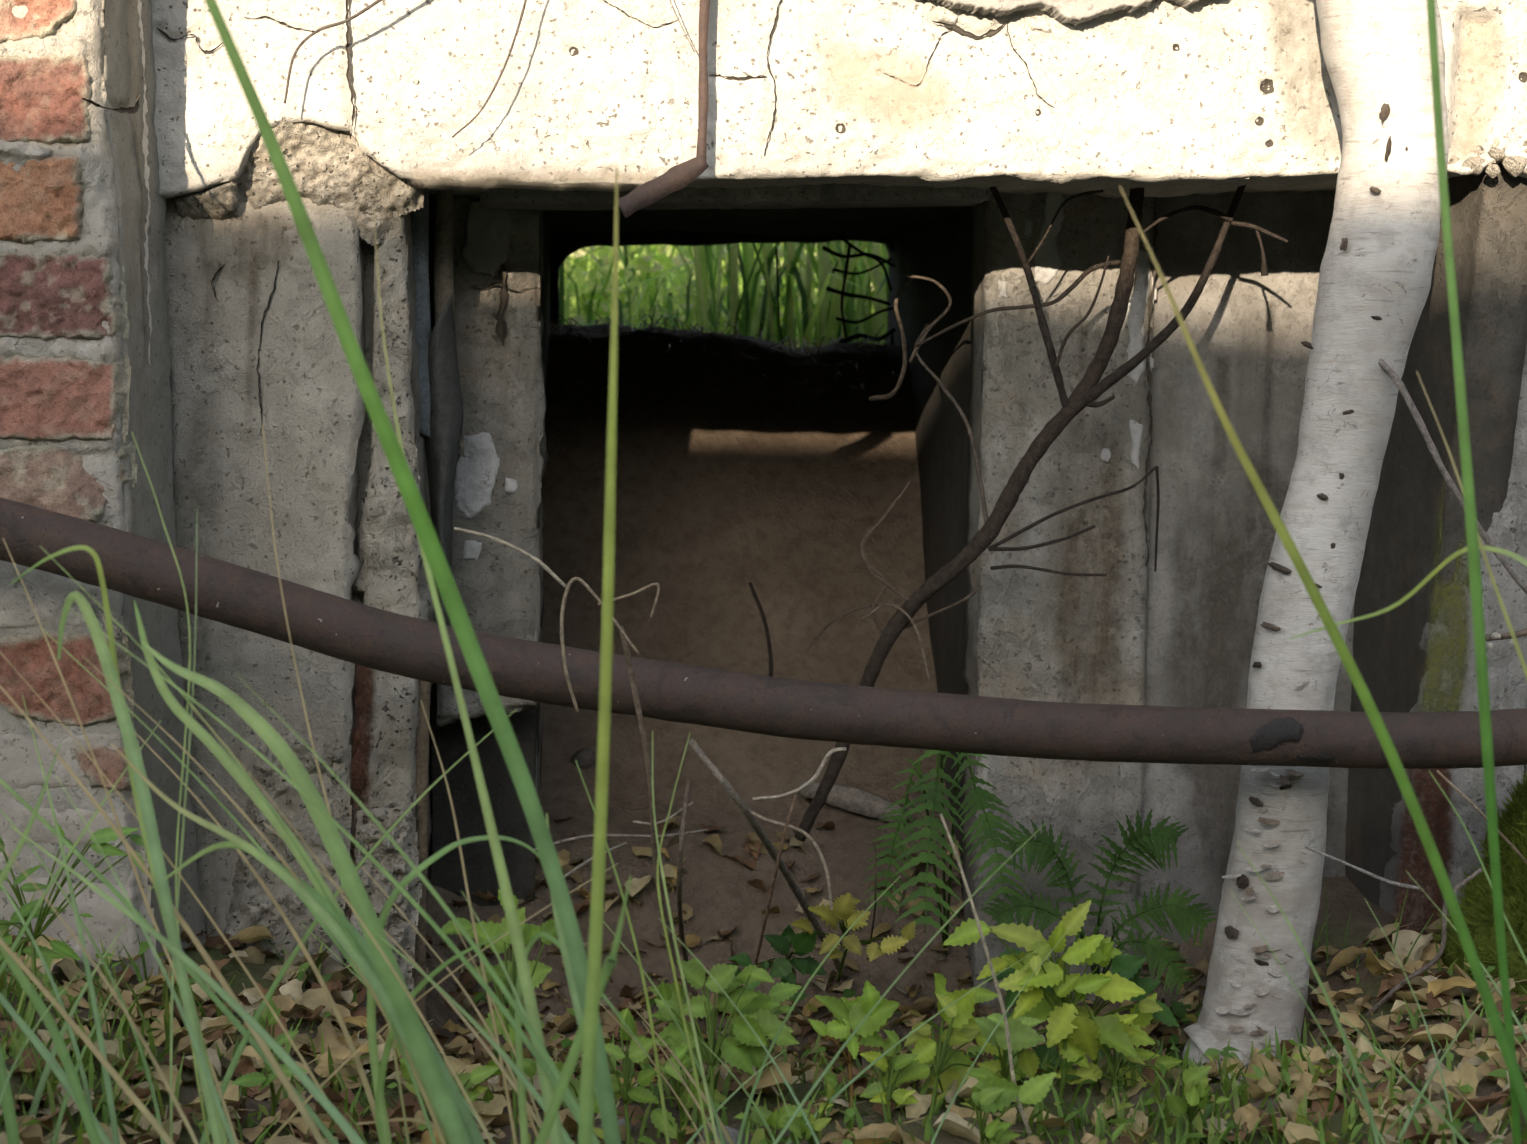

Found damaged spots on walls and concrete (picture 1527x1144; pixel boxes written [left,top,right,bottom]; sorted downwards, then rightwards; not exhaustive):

crack [604,0,678,27]
crack [710,0,782,155]
crack [884,21,1054,108]
flaking render [936,0,1199,33]
crack [81,0,356,365]
spalling [171,113,425,246]
crack [257,261,279,436]
peeling [454,432,518,519]
peeling [463,540,482,561]
damp [1059,476,1120,685]
damp [1174,471,1288,708]
damp [1188,764,1241,880]